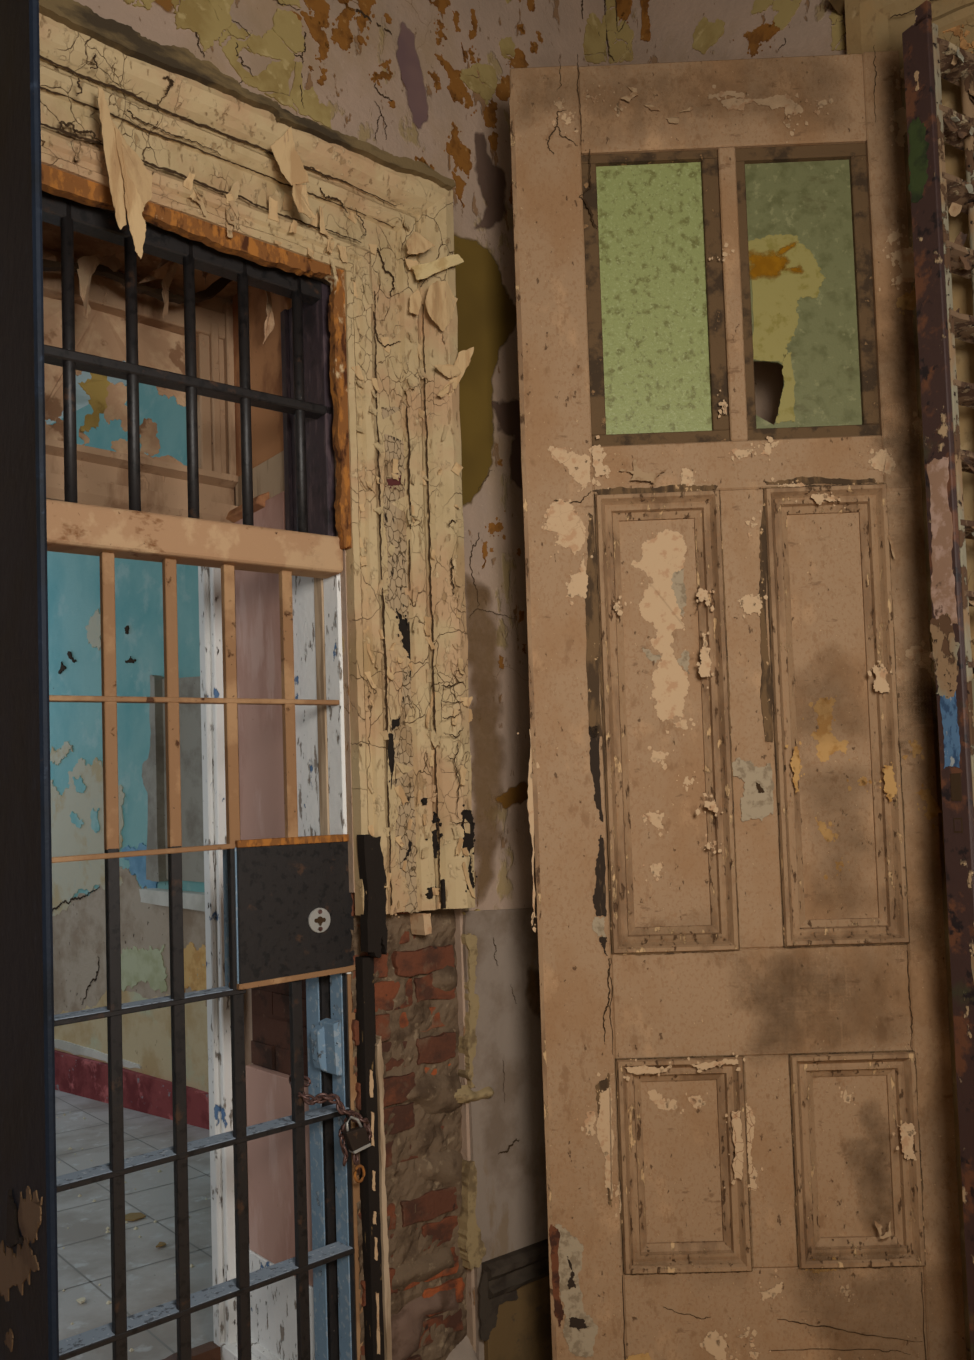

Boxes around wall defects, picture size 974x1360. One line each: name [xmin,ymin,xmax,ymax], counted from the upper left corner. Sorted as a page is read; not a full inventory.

peeling [97,86,153,259]
crack [195,21,253,84]
peeling [171,0,376,317]
crack [277,0,306,107]
peeling [666,83,833,143]
peeling [43,253,185,375]
peeling [263,291,275,344]
peeling [44,363,186,465]
crack [40,54,513,905]
spalling [351,215,518,1360]
spalling [50,741,206,1015]
peeling [0,1186,43,1302]